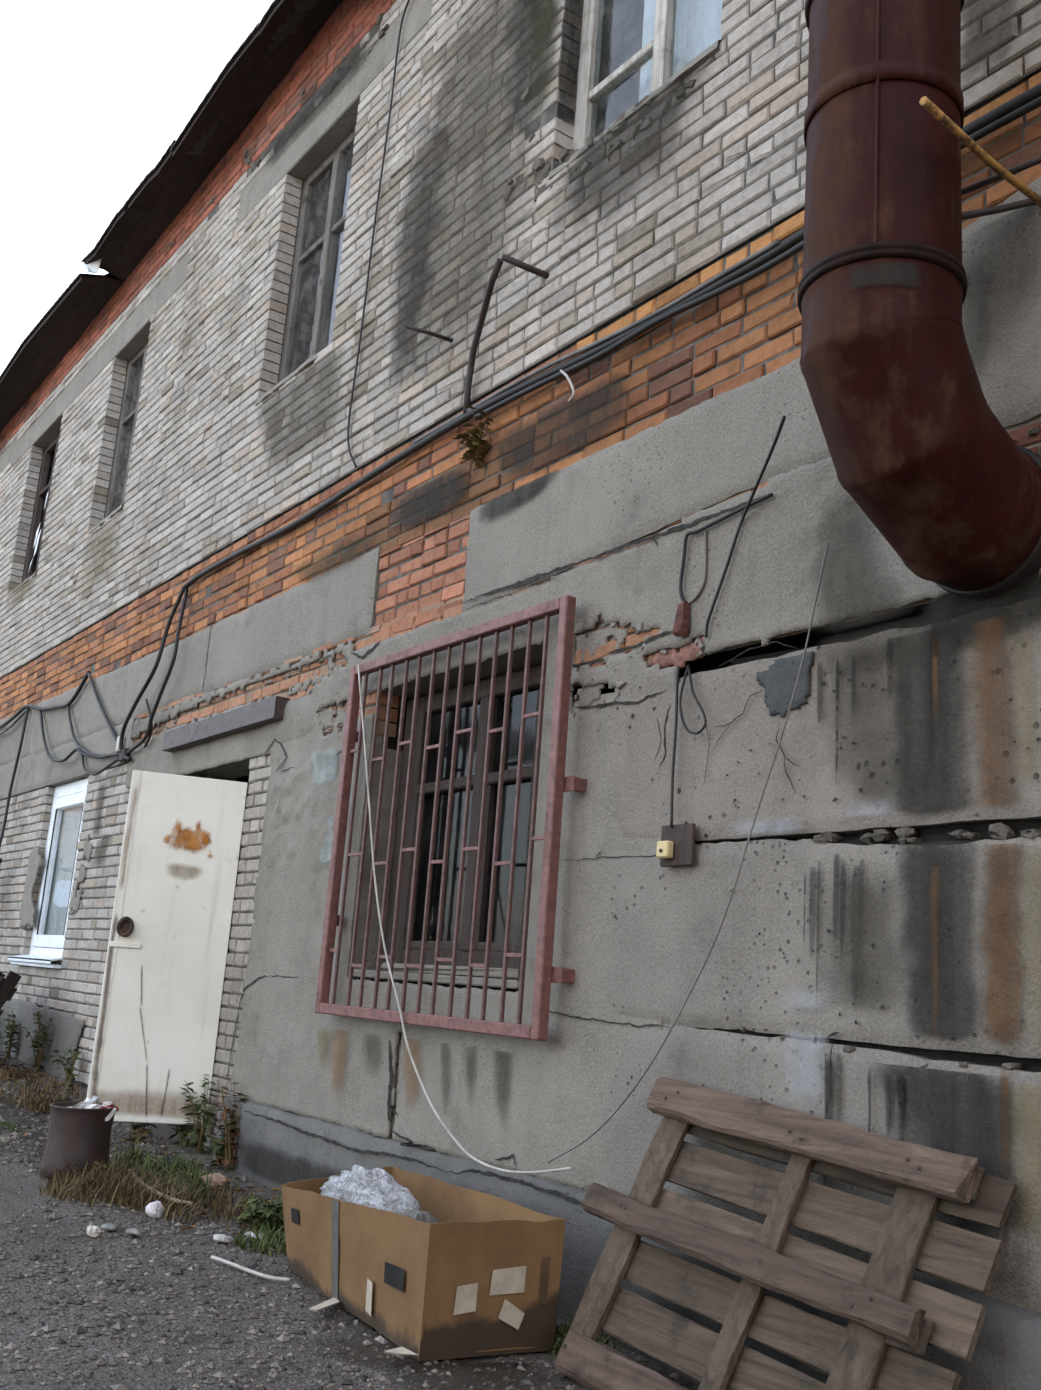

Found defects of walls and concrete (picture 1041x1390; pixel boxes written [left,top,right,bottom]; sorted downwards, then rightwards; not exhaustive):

water stain [394,0,584,356]
spalling [501,95,653,224]
spalling [570,622,706,713]
water stain [817,623,967,813]
corrosion [974,618,1011,804]
corrosion [164,823,211,857]
water stain [804,855,879,997]
water stain [901,840,973,1038]
corrosion [982,843,1020,1042]
water stain [825,1056,841,1119]
water stain [868,1064,1007,1178]
water stain [953,1216,993,1237]